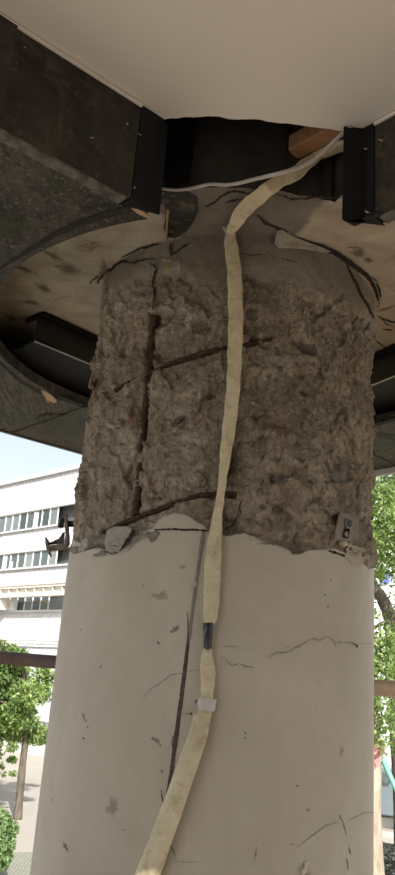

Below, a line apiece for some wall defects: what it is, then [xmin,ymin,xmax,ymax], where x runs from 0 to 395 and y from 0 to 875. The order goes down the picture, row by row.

crack [2,181,337,324]
crack [257,214,395,348]
spalling [73,230,379,569]
crack [221,636,372,668]
crack [289,812,374,847]